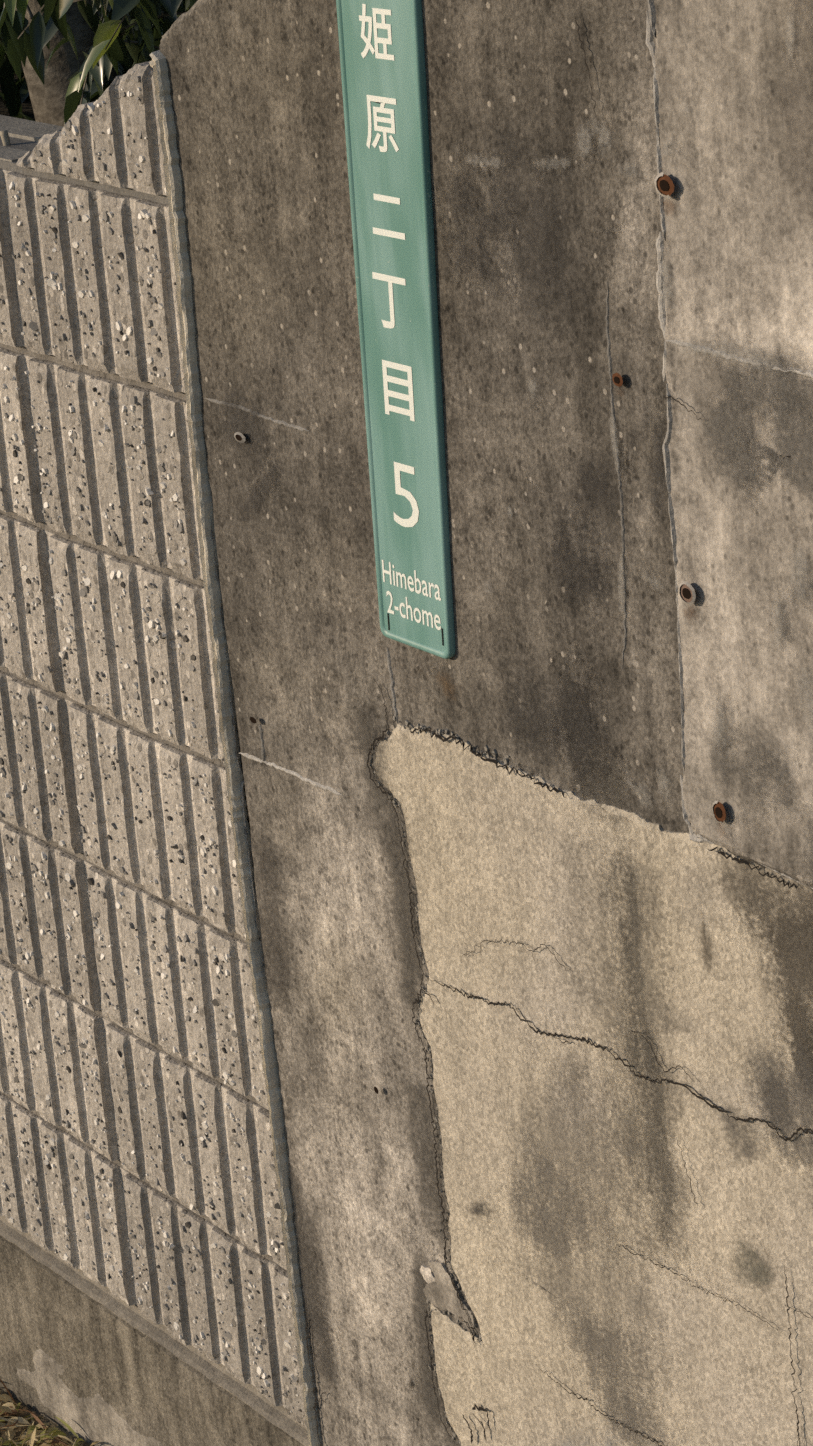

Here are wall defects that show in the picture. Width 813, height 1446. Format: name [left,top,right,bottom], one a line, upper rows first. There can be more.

damp [704,346,813,492]
crack [367,679,813,1446]
flaking render [369,716,813,1446]
damp [721,840,813,1164]